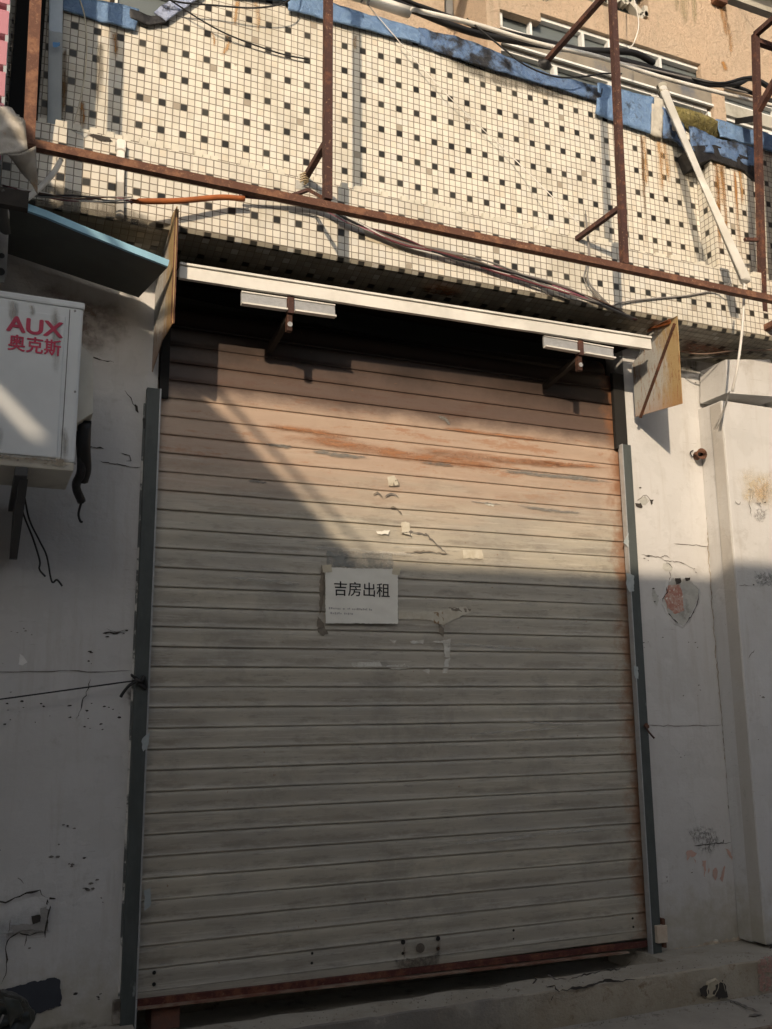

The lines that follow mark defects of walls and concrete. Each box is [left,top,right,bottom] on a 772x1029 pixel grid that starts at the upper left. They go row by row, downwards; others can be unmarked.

rust [641,136,669,207]
rust [716,166,743,237]
spalling [652,563,701,629]
crack [689,832,730,853]
crack [0,878,56,984]
crack [532,963,636,1001]